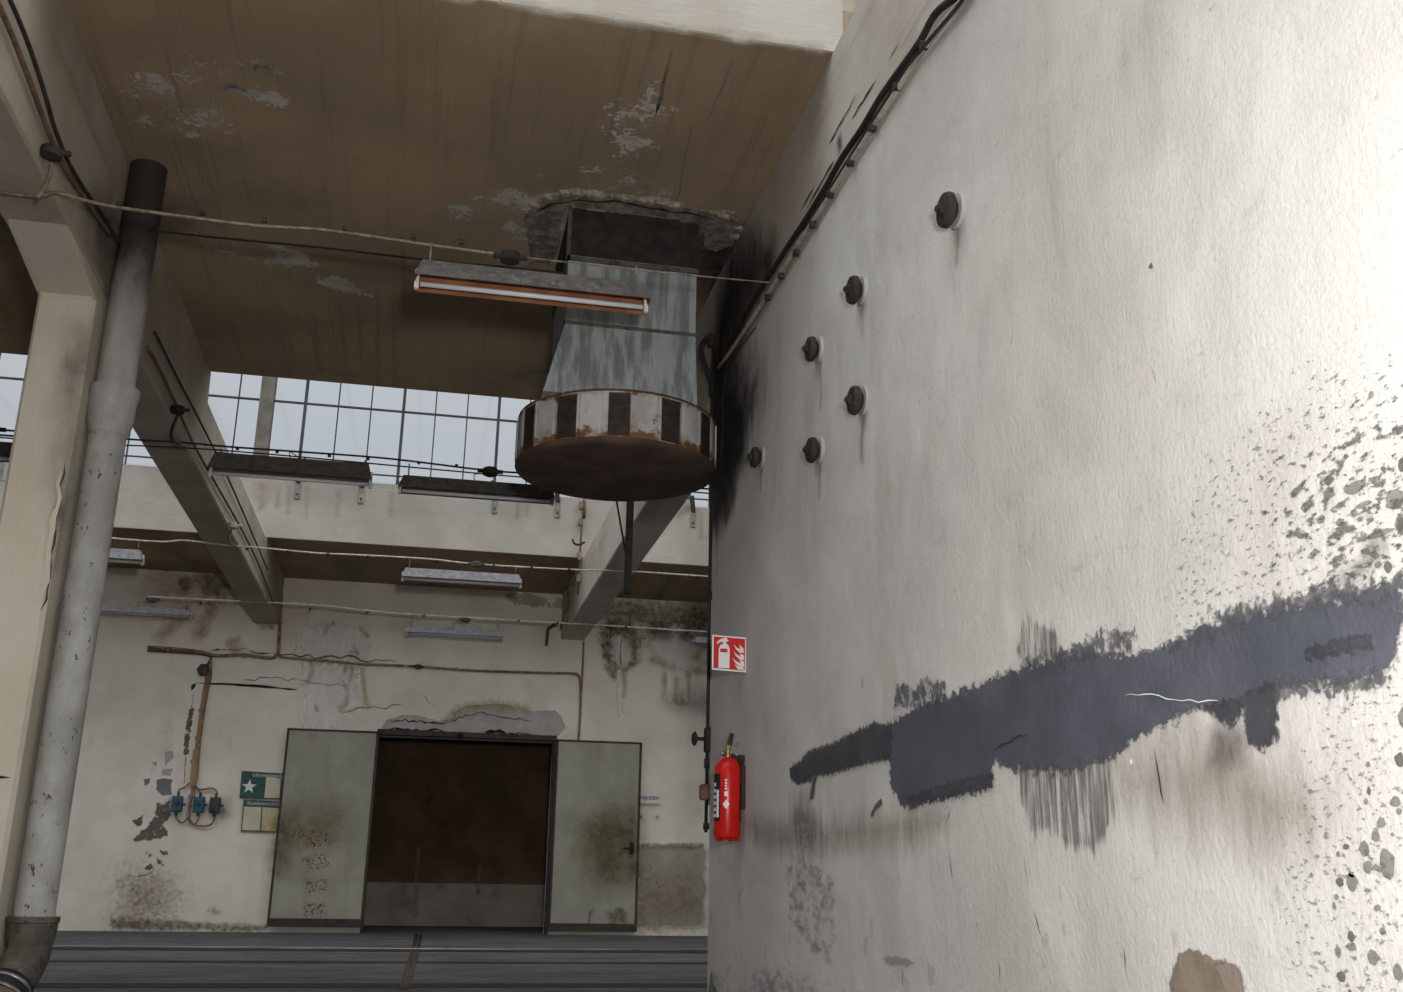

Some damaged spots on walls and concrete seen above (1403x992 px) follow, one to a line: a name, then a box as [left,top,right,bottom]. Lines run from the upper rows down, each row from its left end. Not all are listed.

spalling [500,187,746,273]
water stain [1165,354,1403,638]
water stain [601,578,708,715]
peeling [132,692,195,877]
water stain [1318,676,1403,767]
water stain [637,843,706,927]
water stain [1286,728,1403,992]
peeling [1169,948,1244,992]